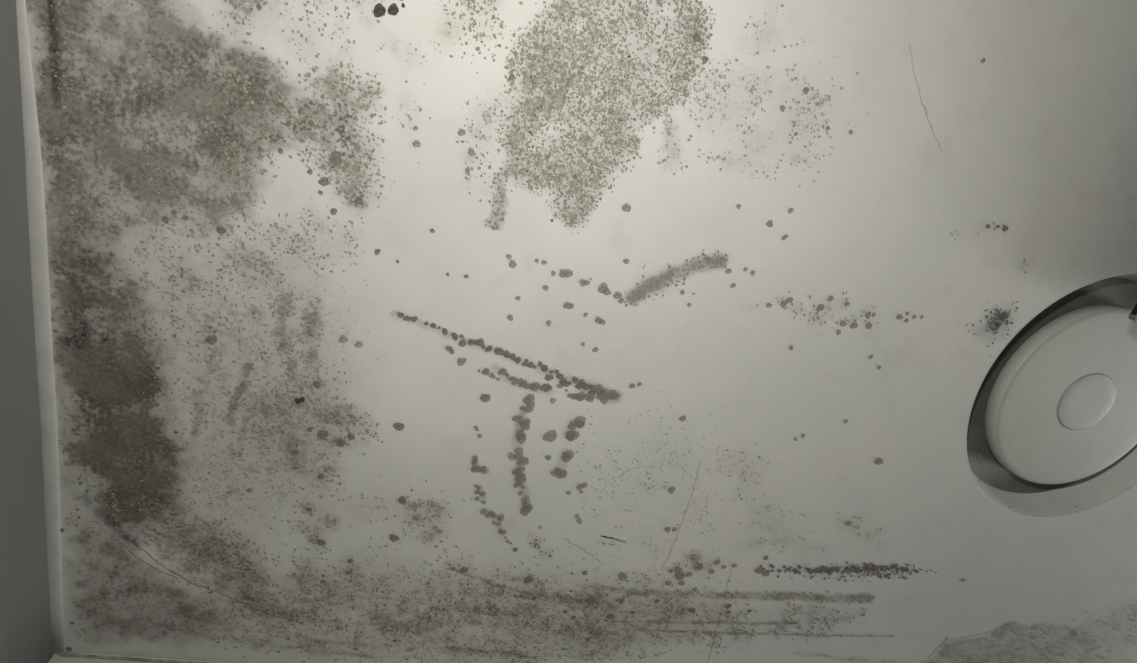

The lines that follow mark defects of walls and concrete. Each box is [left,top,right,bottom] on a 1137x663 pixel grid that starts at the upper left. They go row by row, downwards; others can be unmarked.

leakage [26,0,880,663]
leakage [966,301,1018,347]
mould [754,555,937,582]